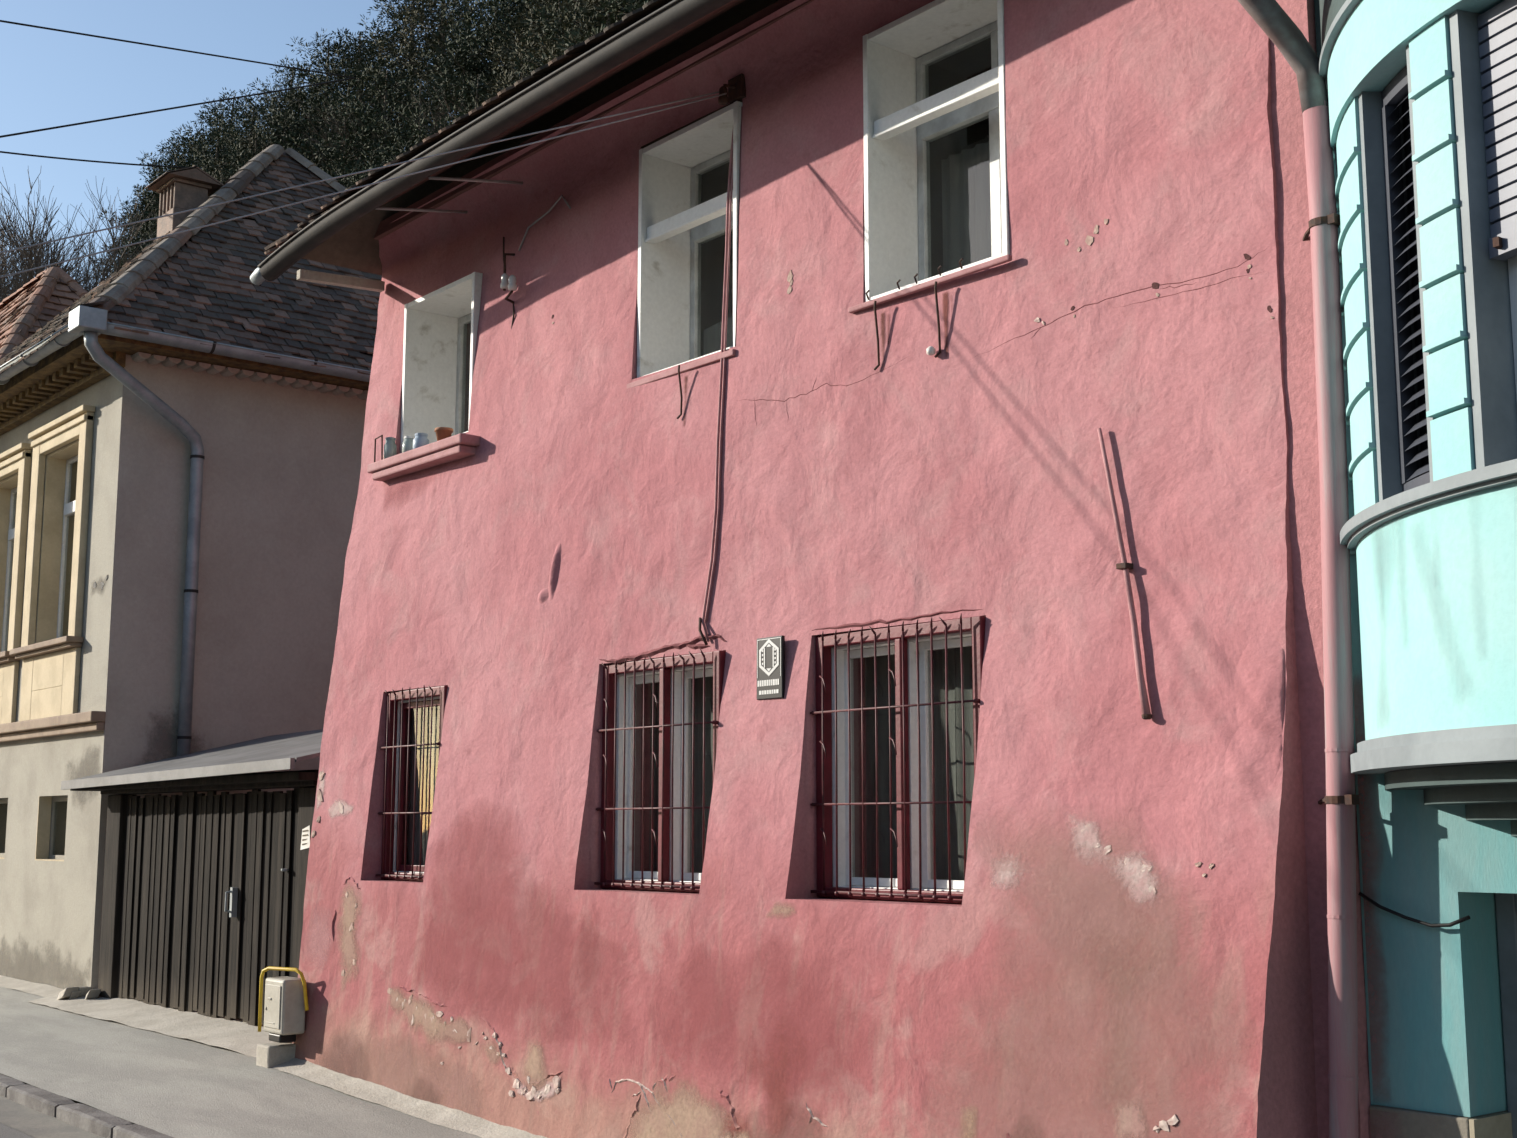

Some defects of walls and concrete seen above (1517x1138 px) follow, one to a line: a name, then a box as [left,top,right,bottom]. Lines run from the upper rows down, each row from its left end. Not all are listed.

flaking render [311,771,343,838]
peeling [332,876,361,980]
peeling [387,986,563,1101]
flaking render [623,1074,748,1138]
spalling [1119,1105,1179,1138]